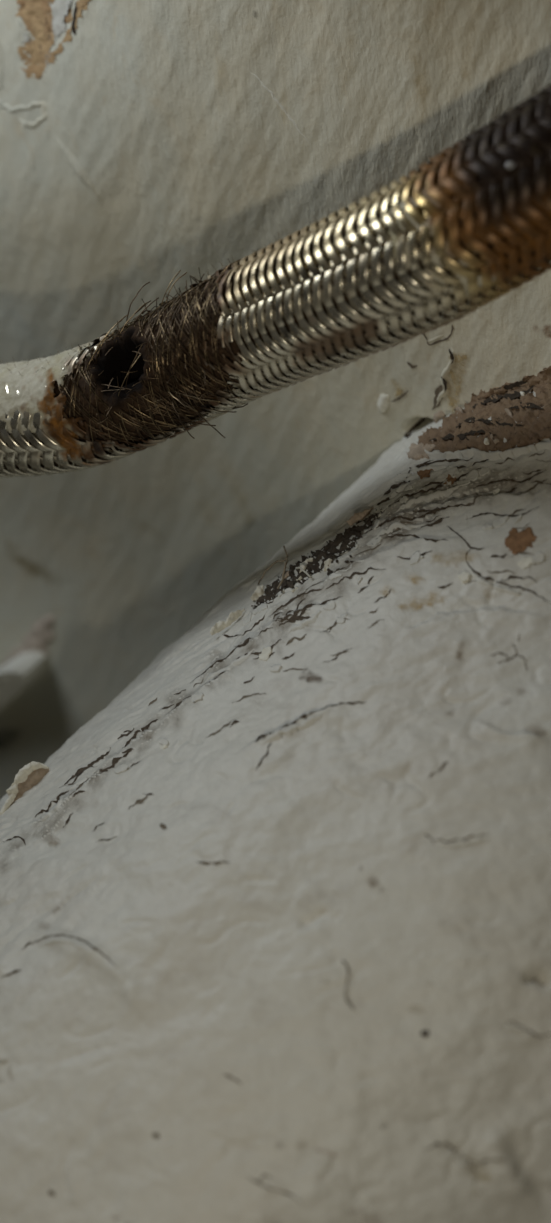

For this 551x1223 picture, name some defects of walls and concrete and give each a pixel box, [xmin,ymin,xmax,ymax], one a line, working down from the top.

peeling [15,0,90,80]
peeling [505,527,537,555]
crack [6,381,551,845]
peeling [0,761,49,815]